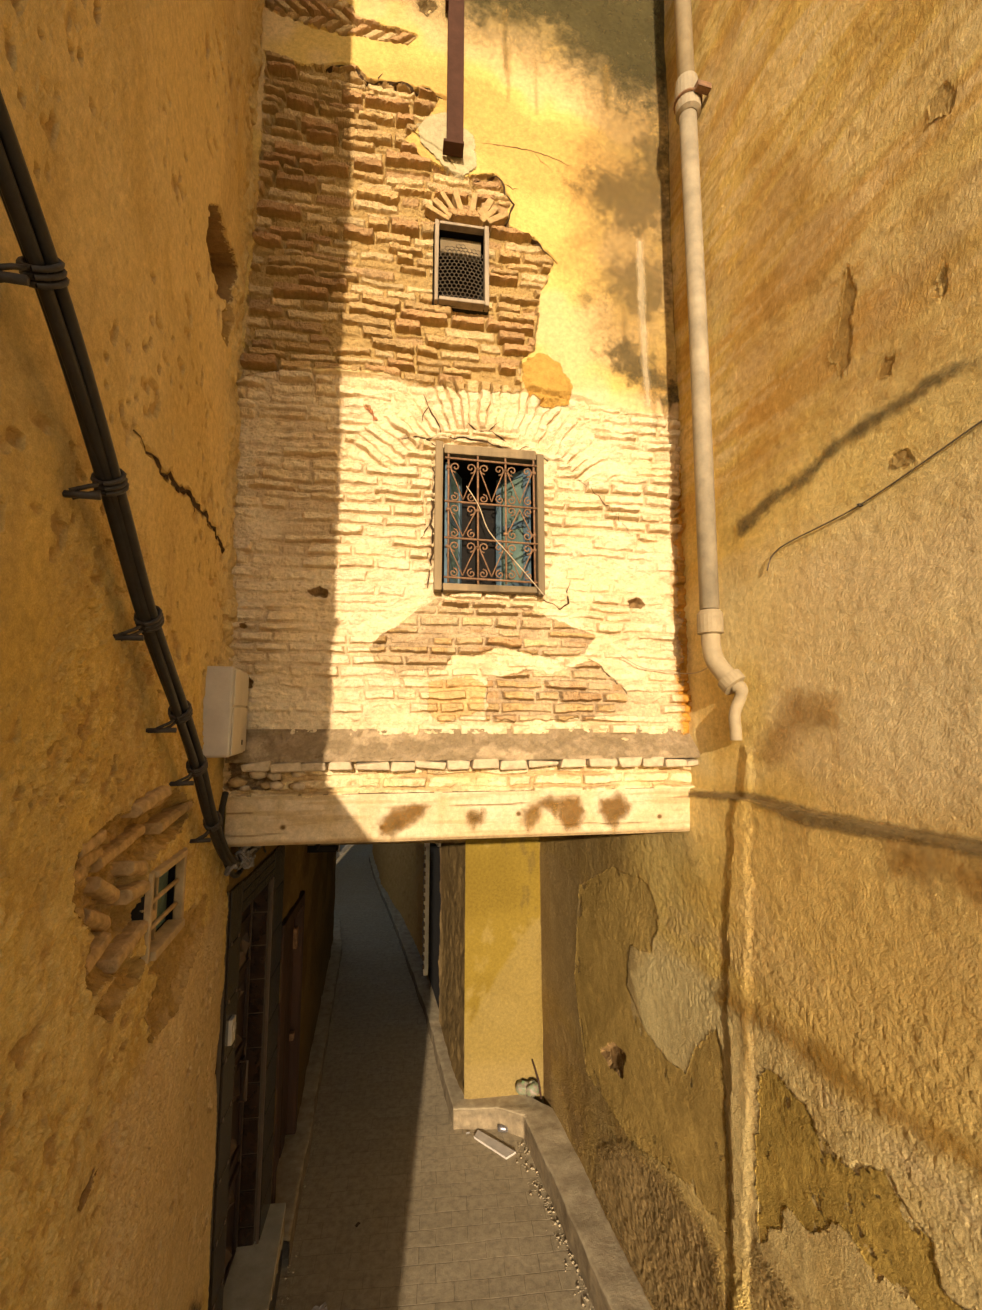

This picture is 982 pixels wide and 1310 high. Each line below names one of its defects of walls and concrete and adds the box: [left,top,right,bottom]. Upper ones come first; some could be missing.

flaking render [206,50,554,394]
water stain [464,0,679,406]
crack [133,429,225,554]
flaking render [72,785,208,1043]
water stain [688,791,982,884]
peeling [574,867,731,1310]
peeling [748,1069,963,1310]